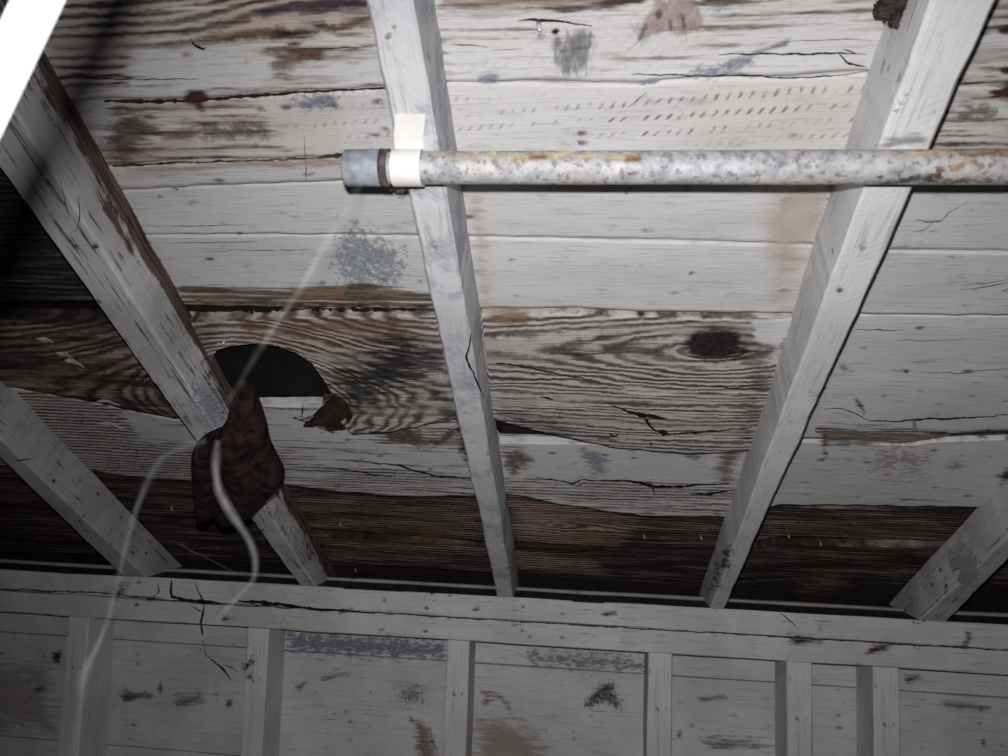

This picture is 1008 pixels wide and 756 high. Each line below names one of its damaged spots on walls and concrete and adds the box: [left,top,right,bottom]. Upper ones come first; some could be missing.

crack [627,38,872,108]
rust [431,149,641,164]
rust [899,148,1008,184]
crack [465,334,752,446]
crack [702,374,769,389]
crack [828,408,1008,422]
crack [536,477,734,496]
crack [2,581,1008,680]